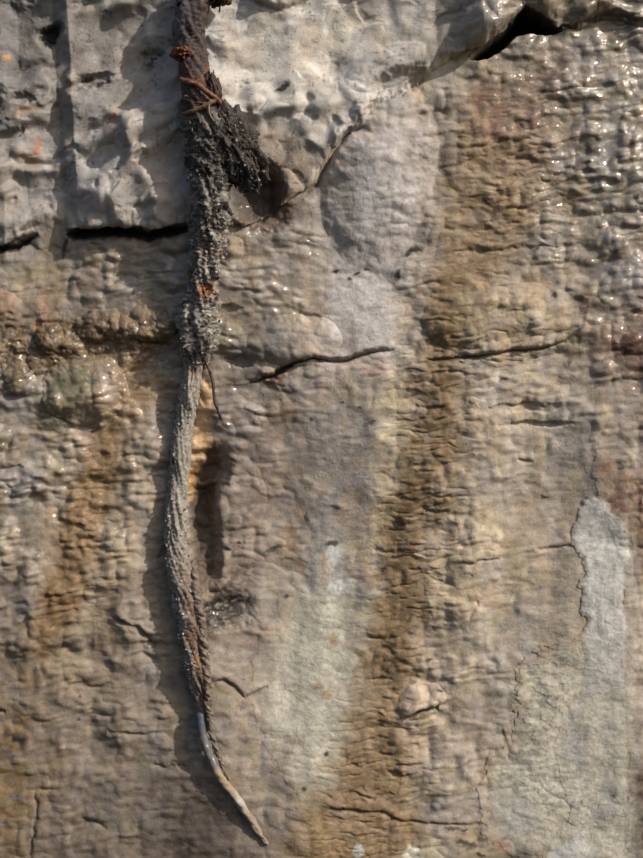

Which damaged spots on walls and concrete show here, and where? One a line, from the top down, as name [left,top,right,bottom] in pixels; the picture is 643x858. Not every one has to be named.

crack [557,9,643,34]
leakage [73,74,114,89]
crack [302,113,367,200]
crack [0,233,39,257]
crack [61,209,190,261]
crack [322,349,394,363]
crack [427,354,479,363]
crack [223,366,295,388]
rust [256,369,296,389]
rust [157,0,272,845]
leakage [113,34,591,858]
leakage [477,495,643,858]